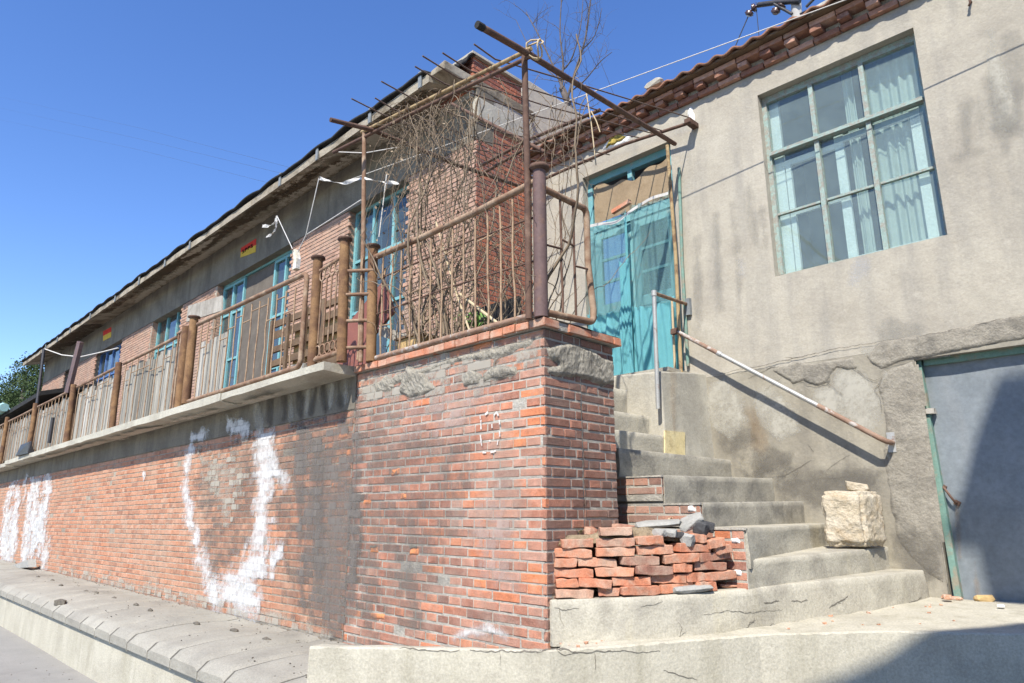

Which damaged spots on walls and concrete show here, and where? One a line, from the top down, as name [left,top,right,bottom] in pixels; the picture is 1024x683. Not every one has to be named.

flaking render [707,380,745,438]
flaking render [755,388,797,438]
flaking render [773,314,1024,584]
leakage [0,337,614,641]
crack [704,596,848,628]